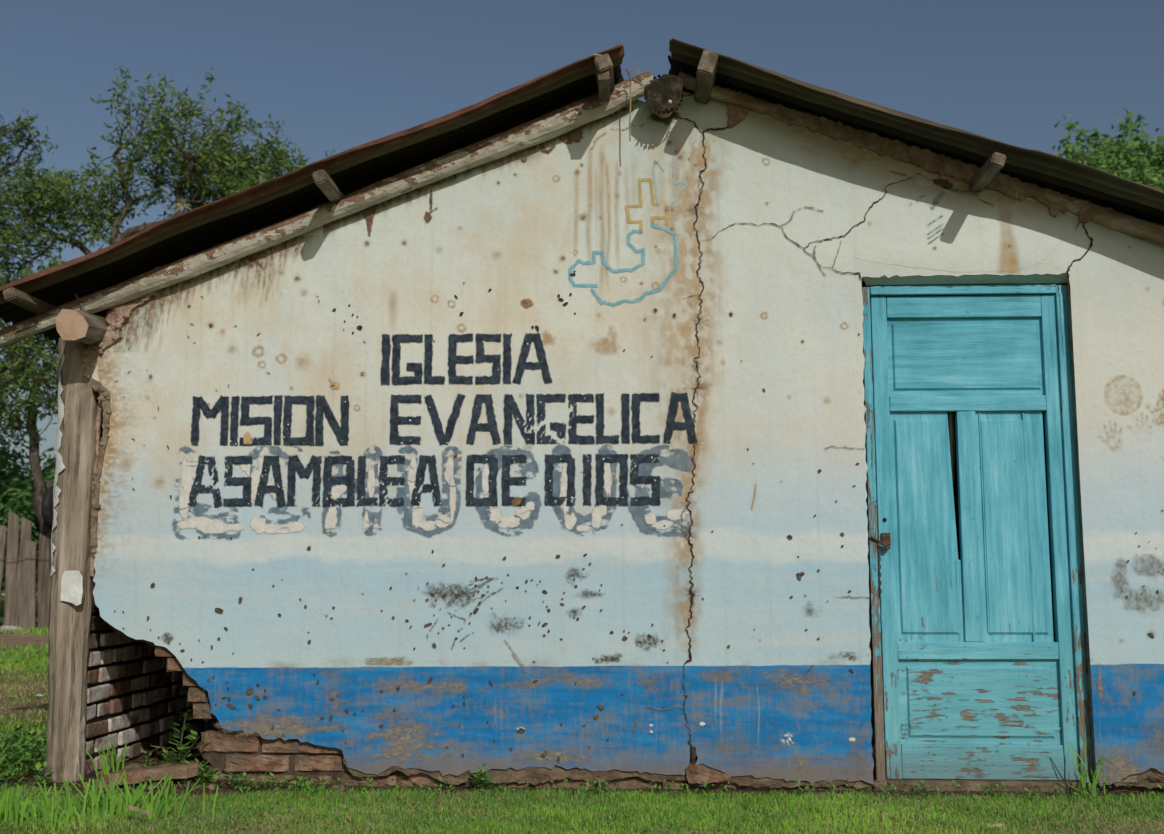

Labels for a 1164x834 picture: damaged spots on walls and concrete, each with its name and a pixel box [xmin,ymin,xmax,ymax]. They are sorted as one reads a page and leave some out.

crack [591,93,993,748]
peeling [170,447,305,539]
peeling [325,483,347,533]
peeling [362,462,388,534]
peeling [401,440,457,531]
peeling [470,458,535,529]
flaking render [147,616,874,790]